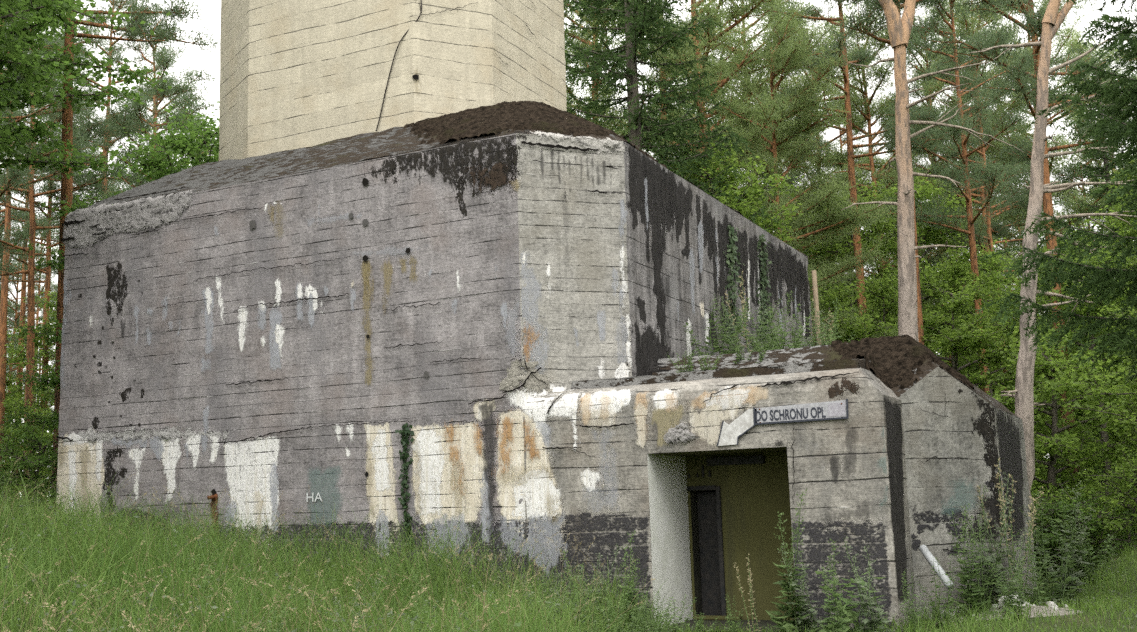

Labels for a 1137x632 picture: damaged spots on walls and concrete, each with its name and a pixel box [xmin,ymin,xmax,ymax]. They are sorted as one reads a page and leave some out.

leakage [357,130,531,216]
leakage [507,143,810,449]
leakage [56,260,219,525]
crack [448,359,567,423]
crack [542,423,634,457]
spalling [663,423,695,443]
leakage [958,389,1025,547]